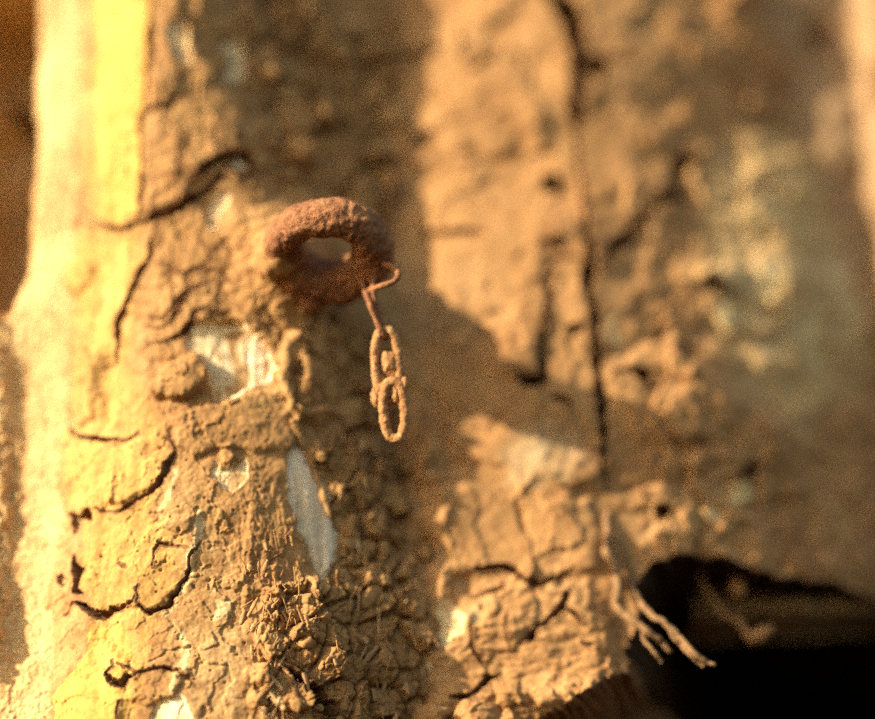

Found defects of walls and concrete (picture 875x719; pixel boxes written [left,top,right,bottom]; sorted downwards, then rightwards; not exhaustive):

crack [73,0,273,370]
crack [512,0,706,494]
crack [699,271,745,297]
rust [370,351,410,408]
crack [65,420,140,443]
crack [95,437,177,515]
peeling [183,312,332,518]
crack [688,435,710,448]
crack [732,458,764,481]
crack [641,490,674,522]
crack [63,538,203,621]